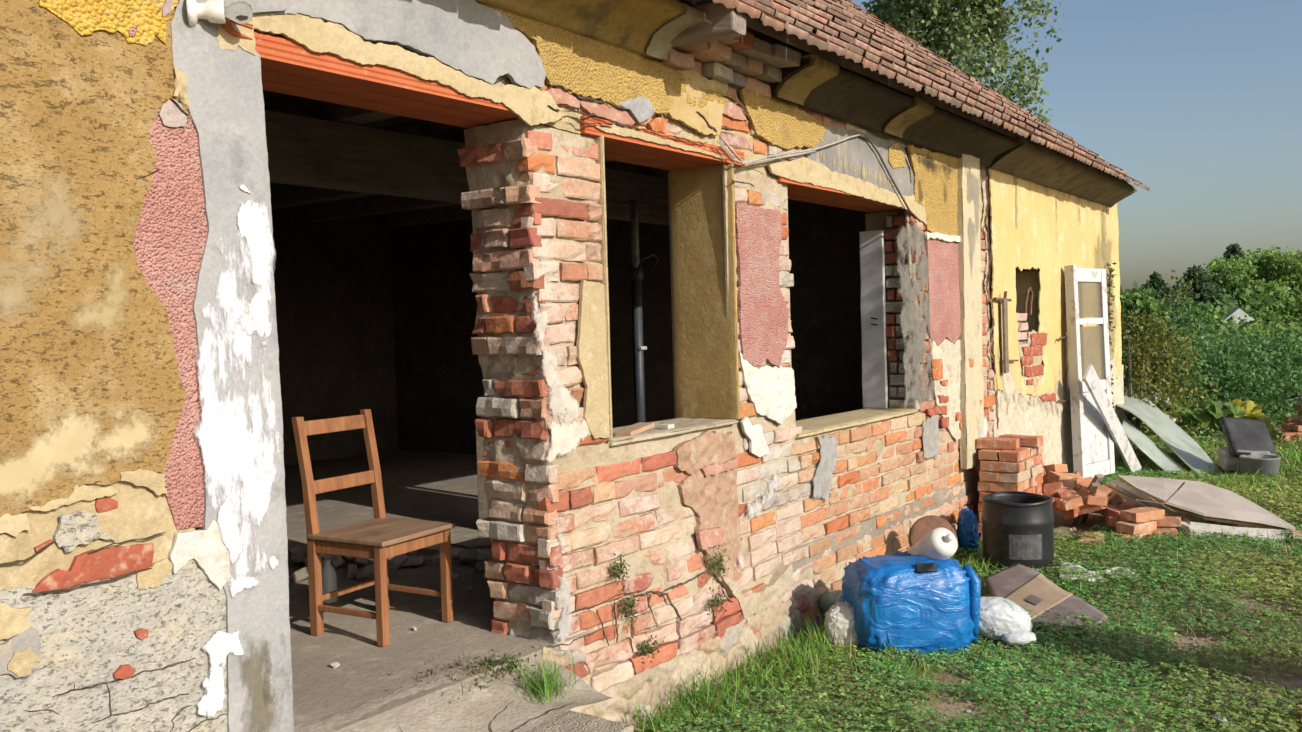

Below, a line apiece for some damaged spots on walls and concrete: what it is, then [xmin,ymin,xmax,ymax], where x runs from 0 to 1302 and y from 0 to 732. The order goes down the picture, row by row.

peeling [38,0,179,46]
spalling [217,19,256,56]
peeling [158,98,190,128]
spalling [540,87,668,134]
spalling [723,88,748,121]
peeling [888,142,912,183]
spalling [1018,330,1056,402]
peeling [196,184,281,598]
spalling [925,359,963,430]
spalling [0,469,195,679]
crack [24,658,224,732]
crack [489,700,577,732]